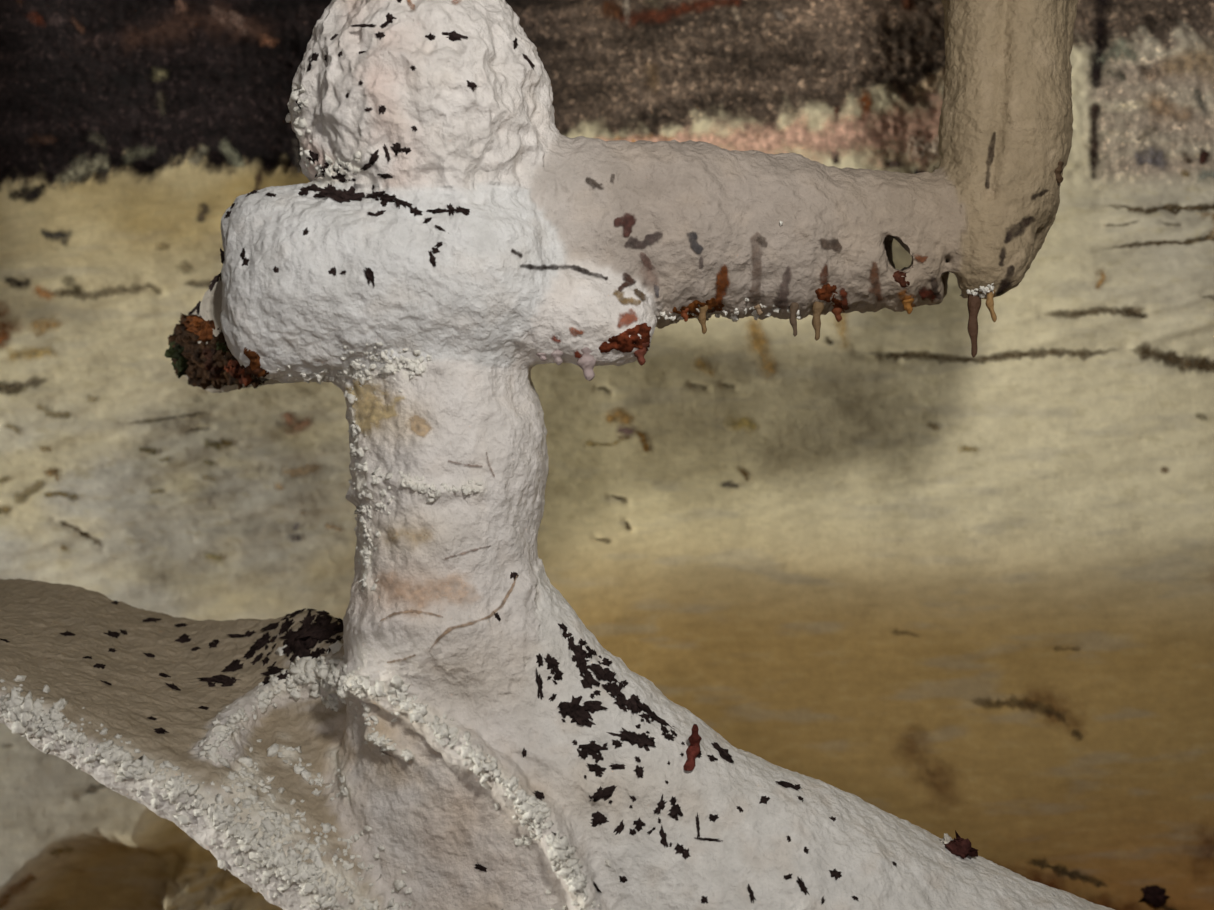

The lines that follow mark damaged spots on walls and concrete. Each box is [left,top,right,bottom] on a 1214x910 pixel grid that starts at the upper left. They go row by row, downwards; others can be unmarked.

rust [670,265,730,318]
rust [748,237,761,302]
rust [774,267,791,309]
rust [820,239,842,252]
rust [815,265,850,312]
rust [869,262,942,310]
rust [598,290,651,357]
rust [164,313,269,392]